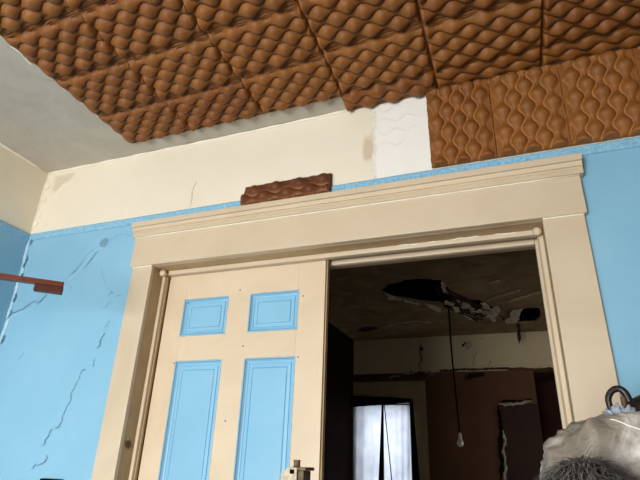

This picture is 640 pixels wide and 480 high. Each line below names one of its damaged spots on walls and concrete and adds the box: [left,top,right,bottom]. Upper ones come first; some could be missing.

crack [31,272,121,469]
peeling [497,398,544,480]